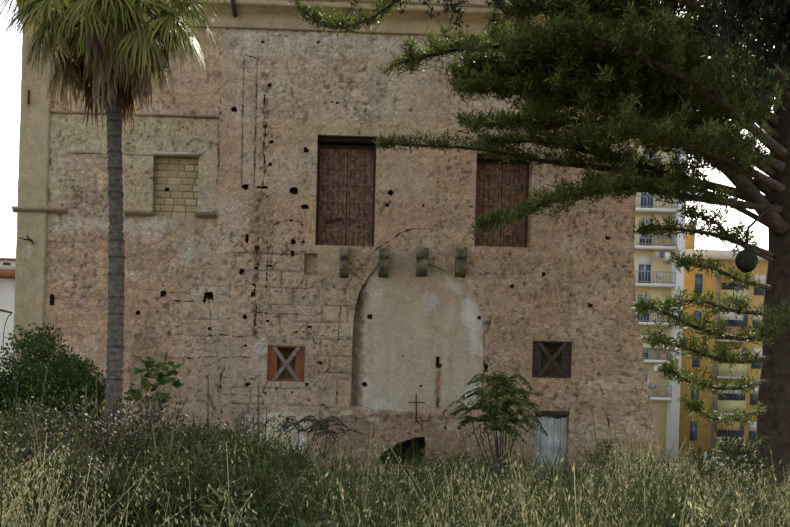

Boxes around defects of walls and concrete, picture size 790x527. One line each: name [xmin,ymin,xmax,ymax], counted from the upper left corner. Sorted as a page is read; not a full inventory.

crack [170,55,451,406]
corrosion [433,368,444,410]